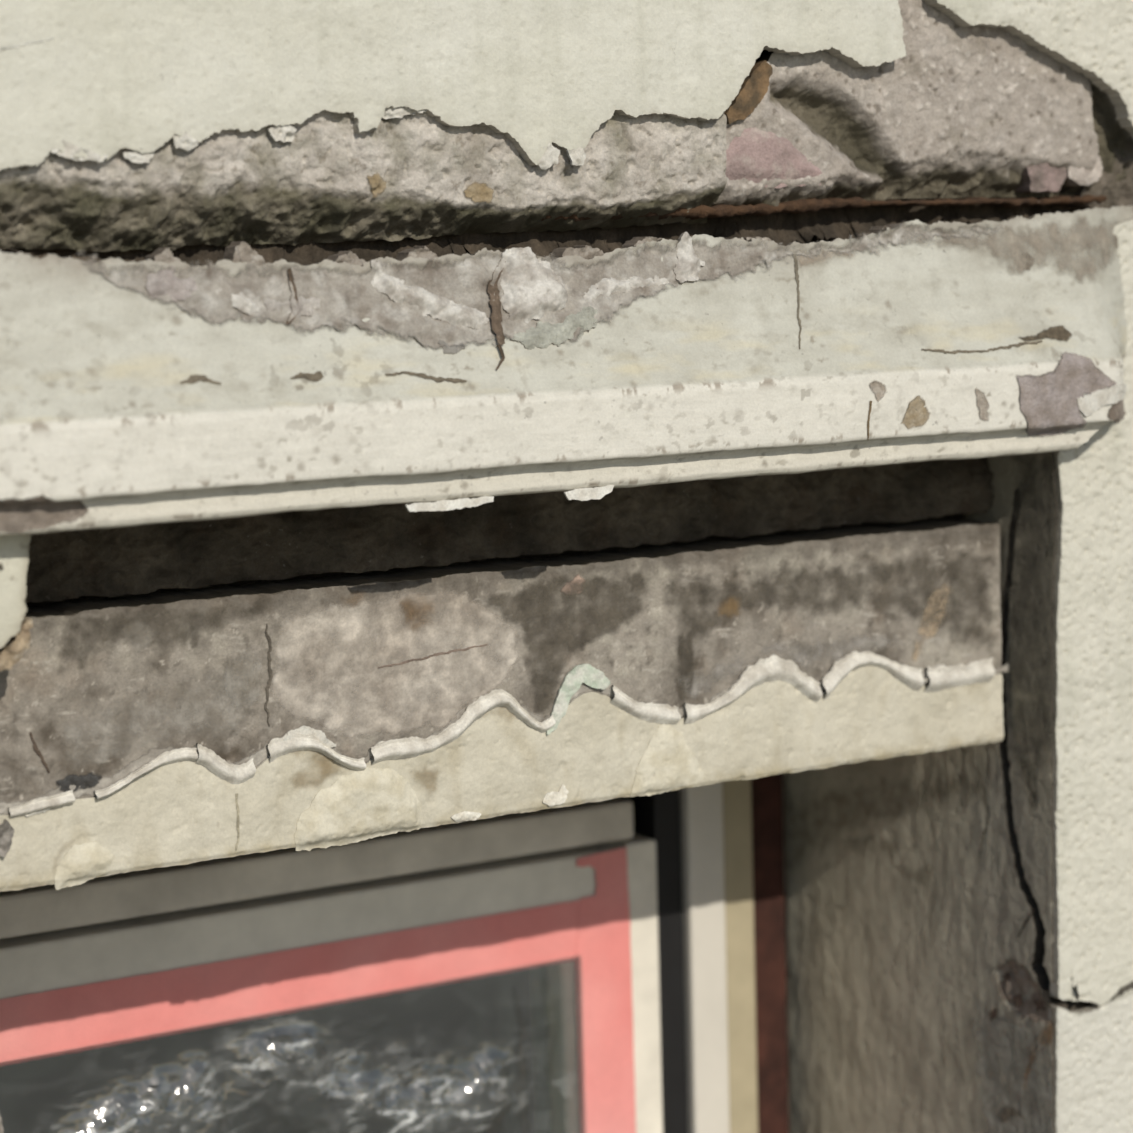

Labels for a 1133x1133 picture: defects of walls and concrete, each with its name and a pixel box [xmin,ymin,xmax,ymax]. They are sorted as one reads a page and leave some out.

spalling [0,0,1133,370]
crack [0,182,1081,349]
crack [922,340,1043,354]
peeling [1016,325,1127,436]
peeling [0,495,88,534]
water stain [127,573,645,741]
water stain [671,553,989,695]
peeling [0,651,1009,857]
crack [1041,978,1133,1011]